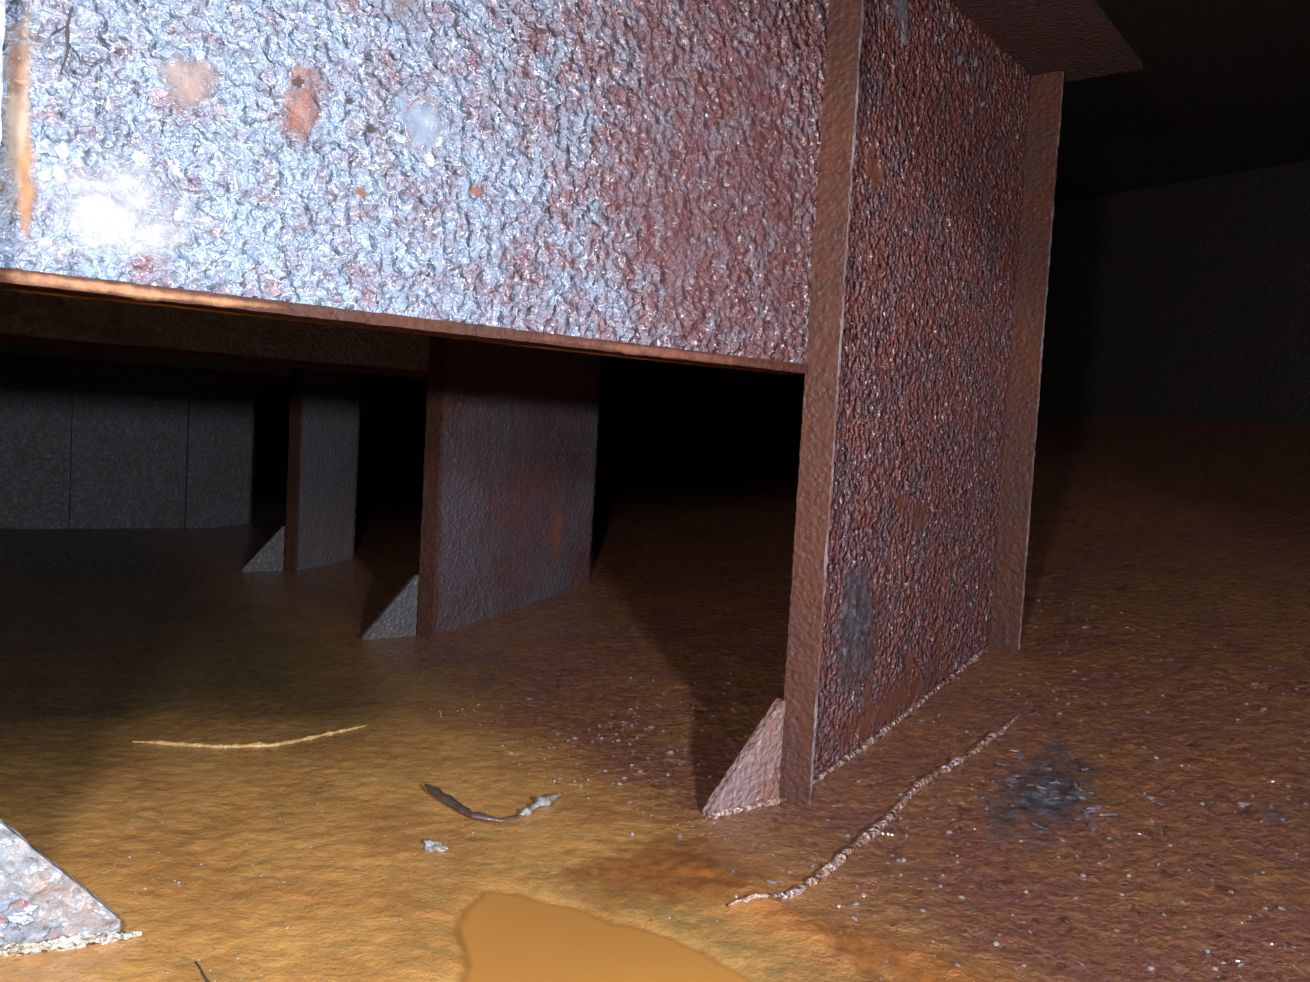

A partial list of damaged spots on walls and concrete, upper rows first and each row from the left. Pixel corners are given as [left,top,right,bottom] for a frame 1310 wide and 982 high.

rust [154,62,226,116]
rust [285,68,313,133]
rust [7,46,35,230]
rust [16,275,259,316]
rust [521,343,732,365]